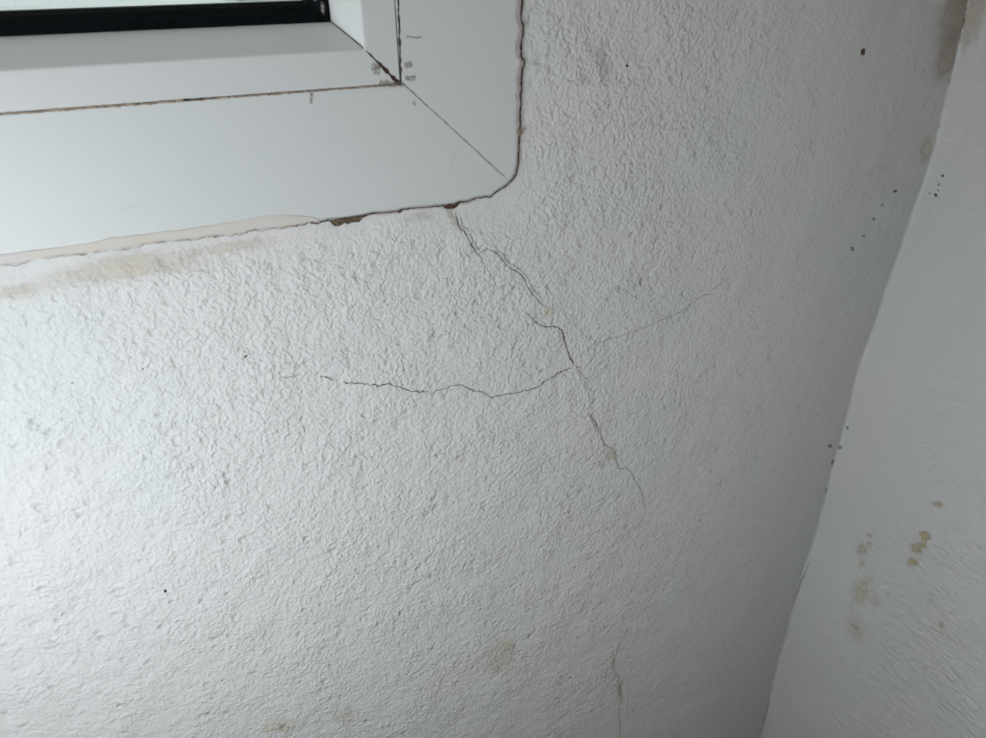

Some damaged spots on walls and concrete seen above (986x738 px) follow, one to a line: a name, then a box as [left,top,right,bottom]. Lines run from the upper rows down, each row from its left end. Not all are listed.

crack [1,0,729,500]